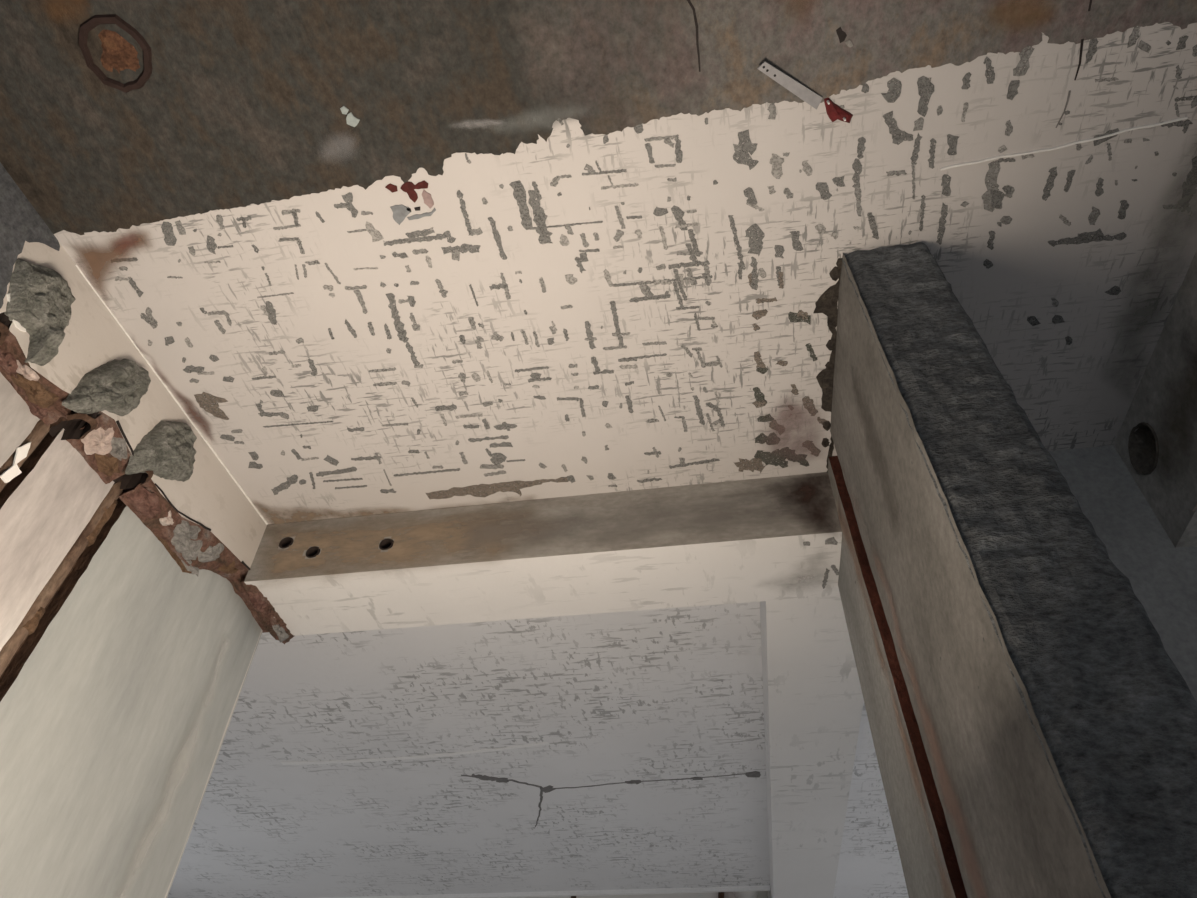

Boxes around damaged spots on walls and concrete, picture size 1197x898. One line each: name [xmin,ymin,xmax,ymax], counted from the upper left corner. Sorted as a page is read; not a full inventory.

crack [687,0,701,72]
crack [1056,0,1092,128]
peeling [0,0,1197,499]
rust [86,500,118,547]
spalling [119,481,294,644]
peeling [822,565,839,589]
crack [461,771,761,827]